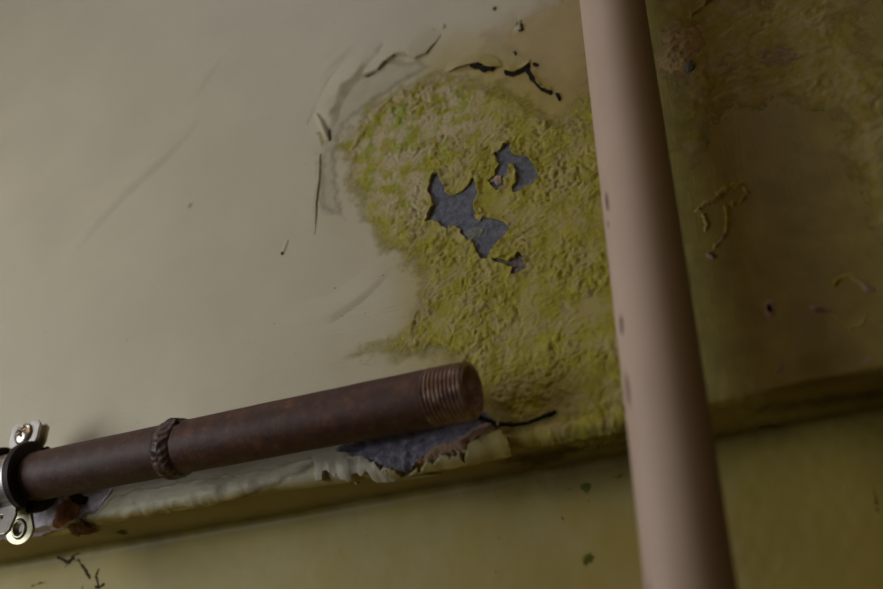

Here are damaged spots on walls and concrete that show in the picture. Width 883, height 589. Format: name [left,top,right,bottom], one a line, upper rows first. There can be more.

leakage [504,0,588,86]
peeling [295,22,447,235]
peeling [489,143,538,192]
leakage [654,0,883,244]
peeling [427,174,526,274]
leakage [339,72,629,449]
flaking render [310,411,512,485]
crack [479,410,557,427]
flaking render [33,487,113,537]
crack [57,553,104,589]